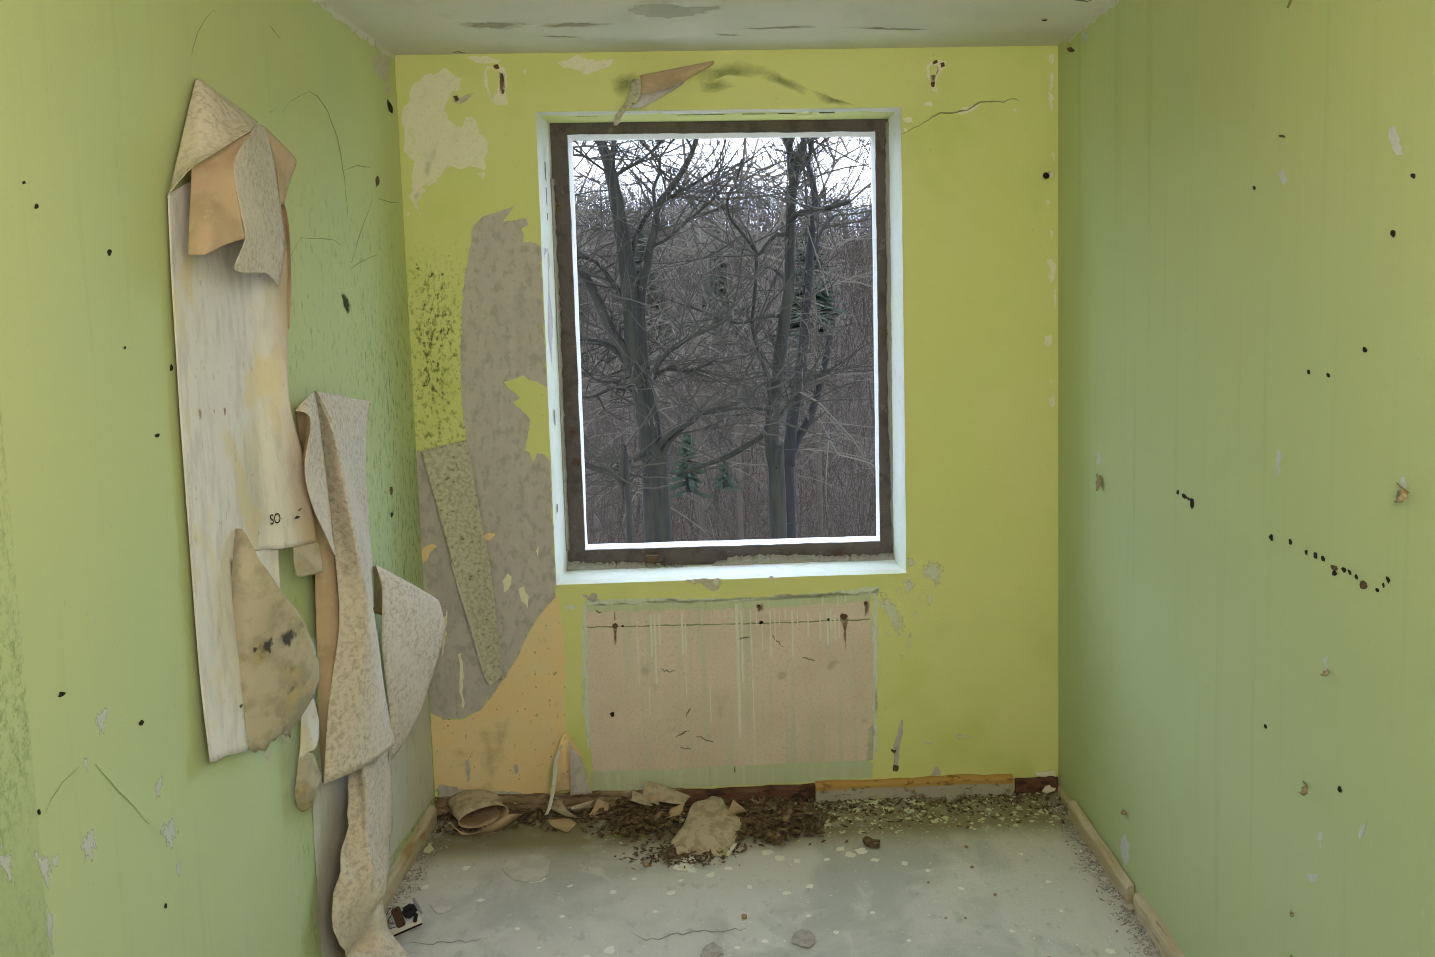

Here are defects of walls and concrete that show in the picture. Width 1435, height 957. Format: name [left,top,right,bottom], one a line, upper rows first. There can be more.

peeling [373,53,526,216]
peeling [557,55,614,75]
spalling [924,60,946,106]
crack [903,98,1019,134]
peeling [389,117,944,856]
peeling [312,769,349,957]